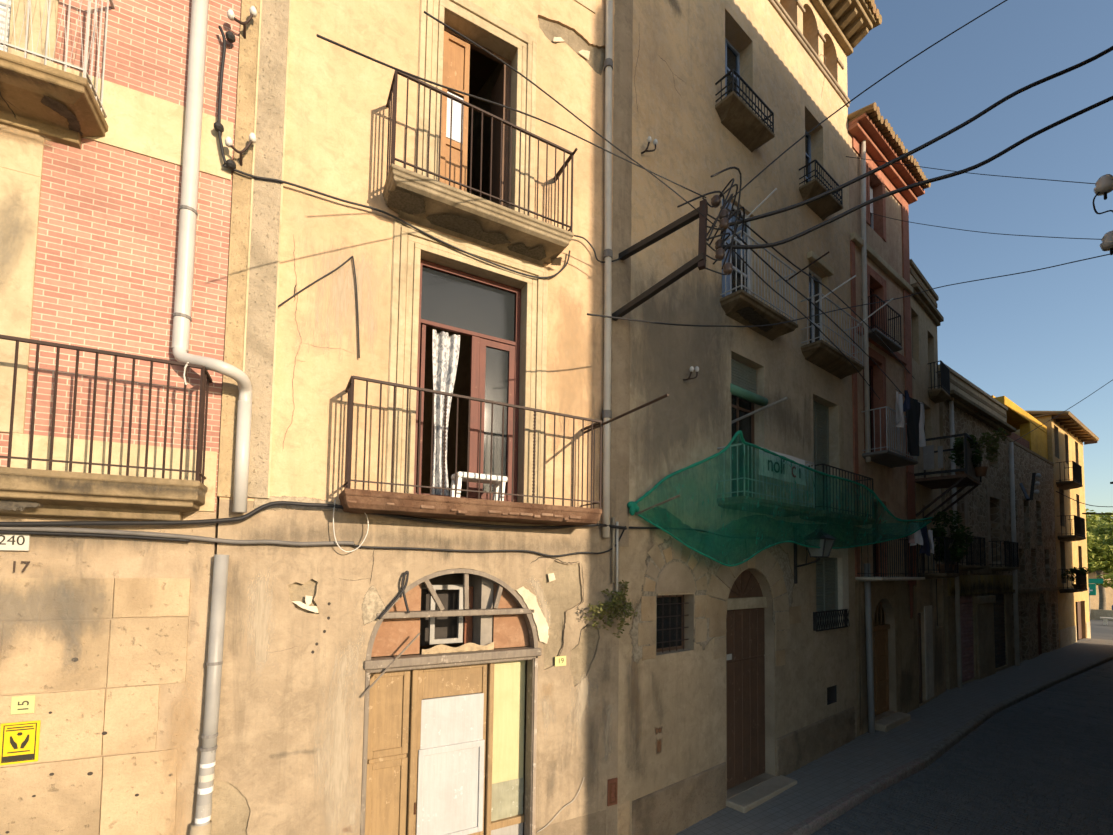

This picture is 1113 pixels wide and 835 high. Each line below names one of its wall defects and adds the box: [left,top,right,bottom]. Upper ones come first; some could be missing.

leakage [41,95,83,136]
peeling [387,190,562,266]
spalling [288,579,319,614]
spalling [532,560,600,687]